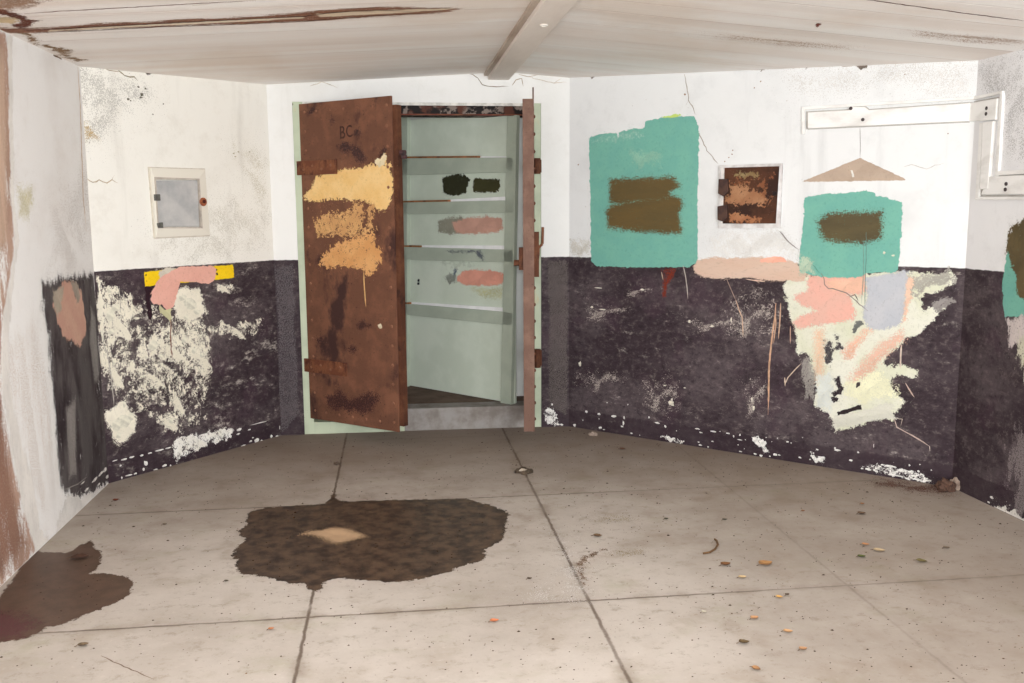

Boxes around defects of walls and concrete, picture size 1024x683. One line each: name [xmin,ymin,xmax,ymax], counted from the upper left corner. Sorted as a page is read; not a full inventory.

rust [0,0,465,62]
crack [684,74,716,162]
water stain [0,31,134,643]
water stain [231,494,510,592]